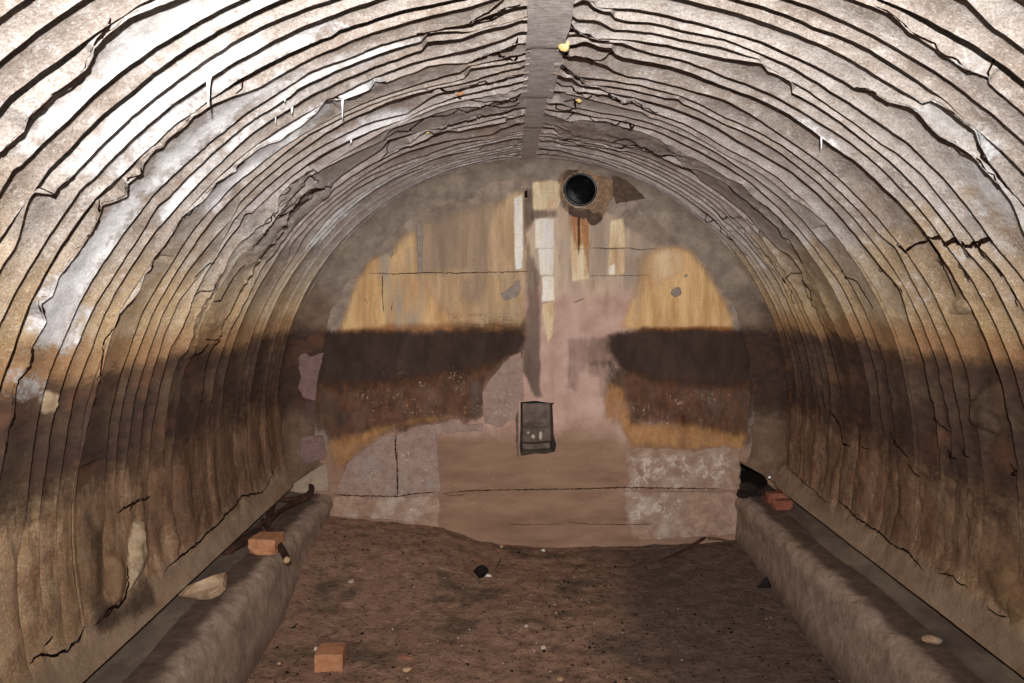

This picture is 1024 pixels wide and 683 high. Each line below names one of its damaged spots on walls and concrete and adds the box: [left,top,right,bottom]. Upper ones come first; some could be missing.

spalling [381,81,527,153]
spalling [544,93,714,174]
spalling [160,171,342,362]
rust [572,216,588,251]
crack [896,230,1018,307]
leakage [0,181,561,540]
peeling [290,352,524,527]
crack [339,435,719,497]
leakage [609,248,1024,569]
crack [165,463,276,572]
crack [30,566,130,663]
leakage [94,533,153,628]